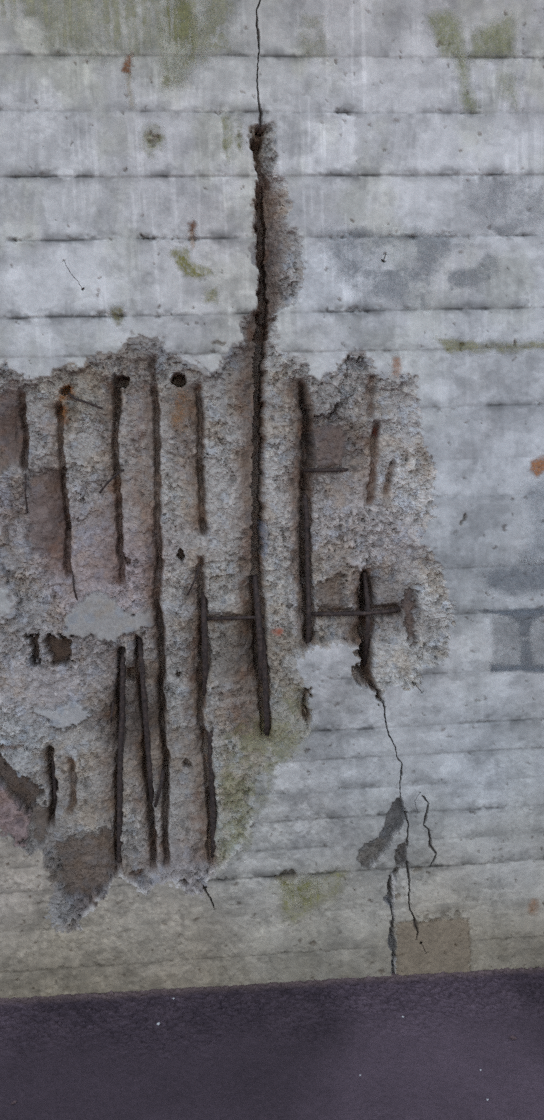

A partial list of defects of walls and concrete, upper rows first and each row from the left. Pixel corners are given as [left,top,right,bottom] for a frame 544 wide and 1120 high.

crack [250,0,270,582]
spalling [0,123,457,934]
corrosion [531,459,544,475]
spalling [357,798,408,974]
crack [380,700,440,954]